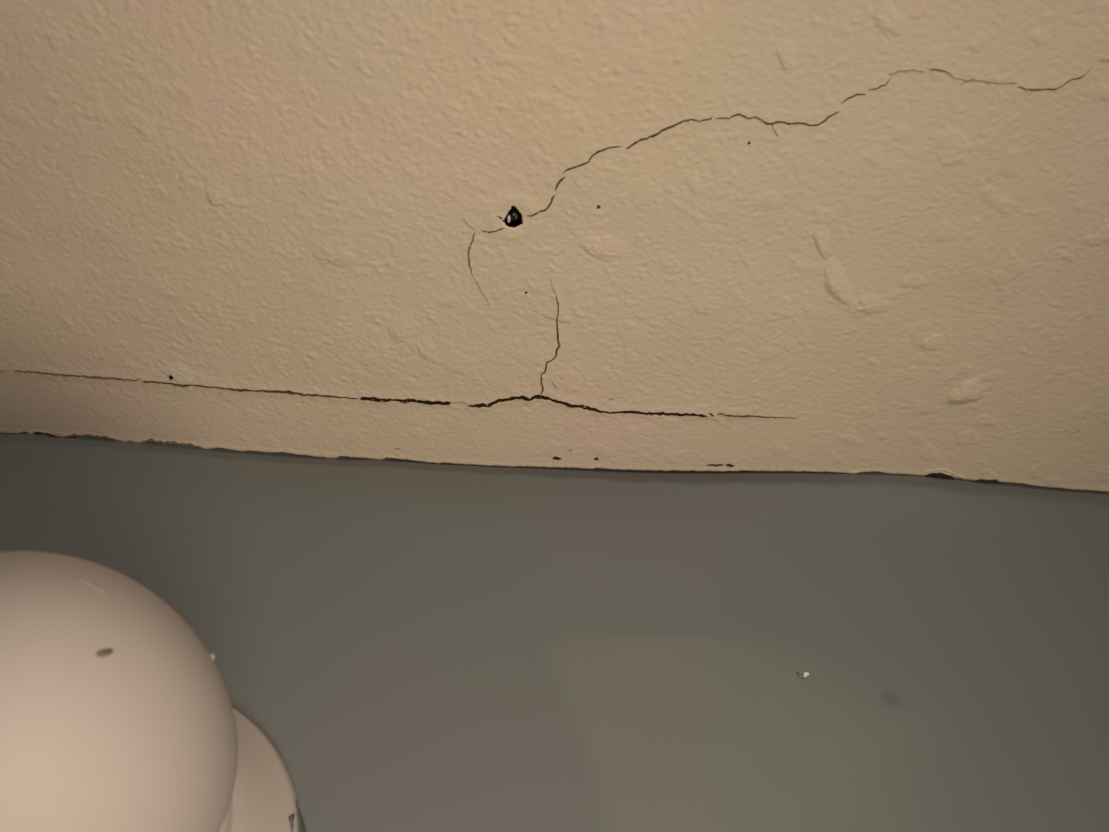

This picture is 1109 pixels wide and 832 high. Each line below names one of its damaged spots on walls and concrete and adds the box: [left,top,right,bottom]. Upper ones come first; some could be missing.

crack [463,60,1109,304]
crack [0,279,794,419]